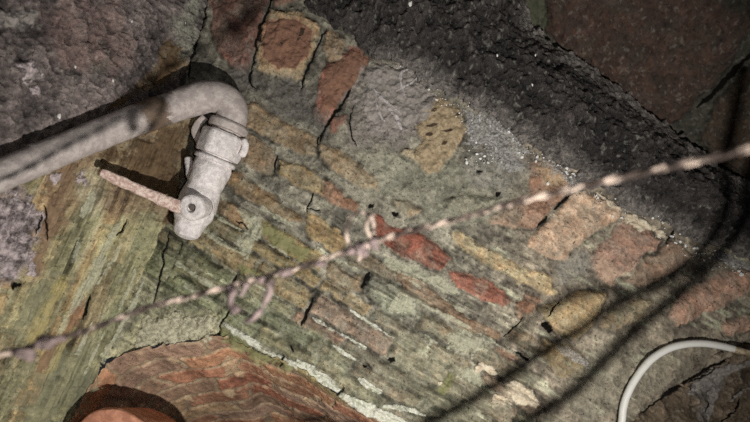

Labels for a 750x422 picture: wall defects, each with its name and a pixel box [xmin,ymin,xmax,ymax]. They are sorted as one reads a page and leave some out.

crack [248,0,272,89]
crack [301,30,327,89]
crack [317,88,357,147]
crack [153,231,170,302]
crack [218,309,230,335]
efflorescence [312,317,367,350]
efflorescence [350,310,393,338]
efflorescence [223,322,426,422]
crack [640,358,727,414]
crack [705,399,740,422]